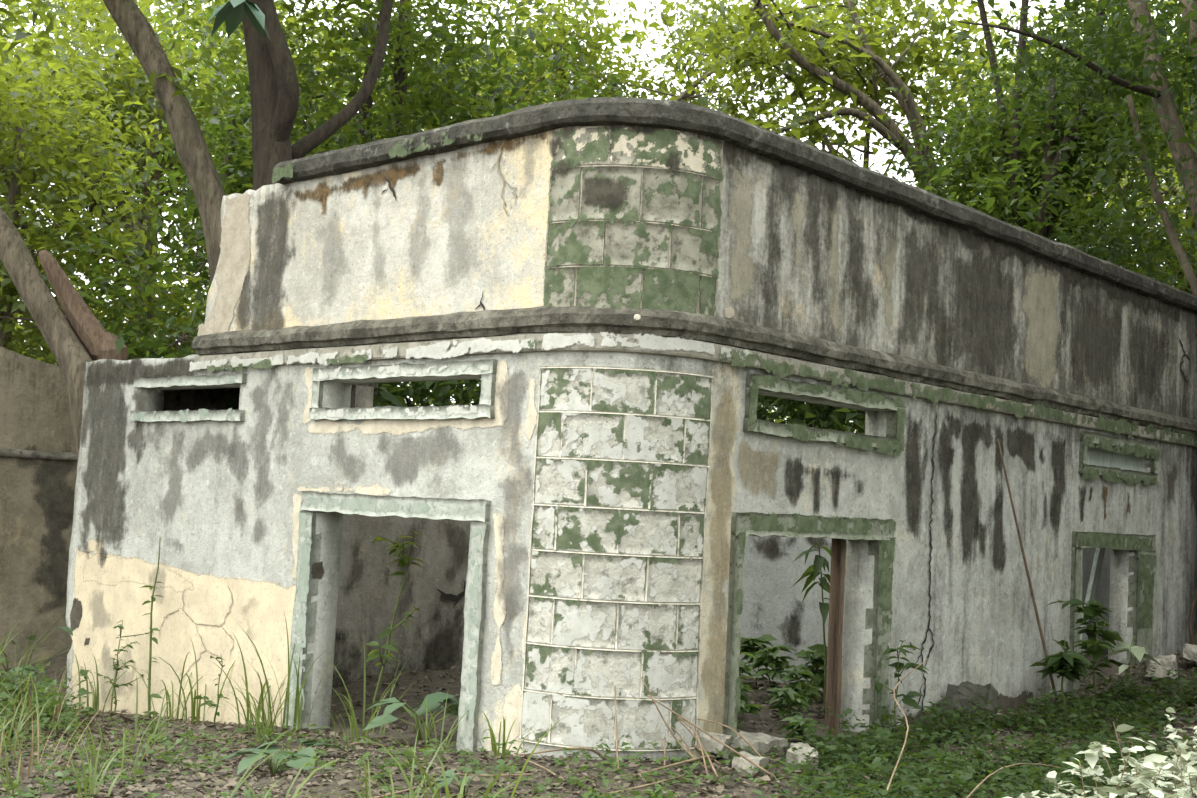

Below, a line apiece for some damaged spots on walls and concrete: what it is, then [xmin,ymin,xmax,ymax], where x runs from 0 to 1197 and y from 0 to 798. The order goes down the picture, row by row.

water stain [237,190,295,330]
crack [490,143,517,214]
water stain [549,125,574,180]
water stain [605,125,659,149]
peeling [543,127,724,316]
water stain [666,152,679,172]
water stain [694,133,1180,403]
water stain [18,358,292,613]
peeling [466,367,712,757]
water stain [905,414,1093,573]
crack [159,584,234,681]